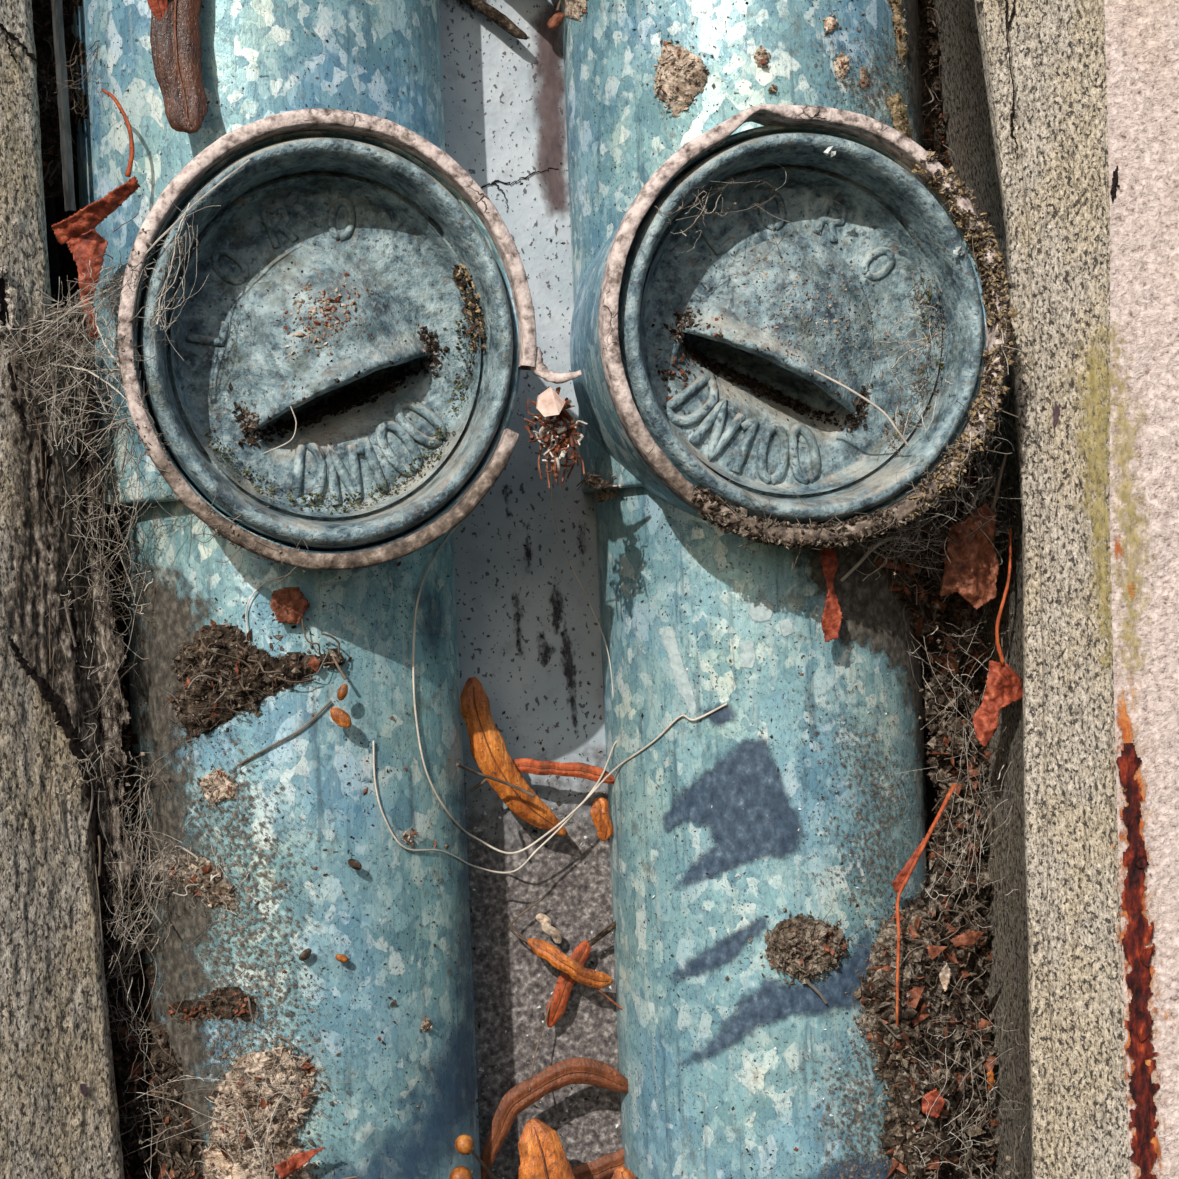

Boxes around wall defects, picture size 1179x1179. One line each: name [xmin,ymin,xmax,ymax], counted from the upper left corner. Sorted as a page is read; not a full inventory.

crack [0,23,38,67]
crack [481,167,558,209]
corrosion [1112,695,1170,1179]